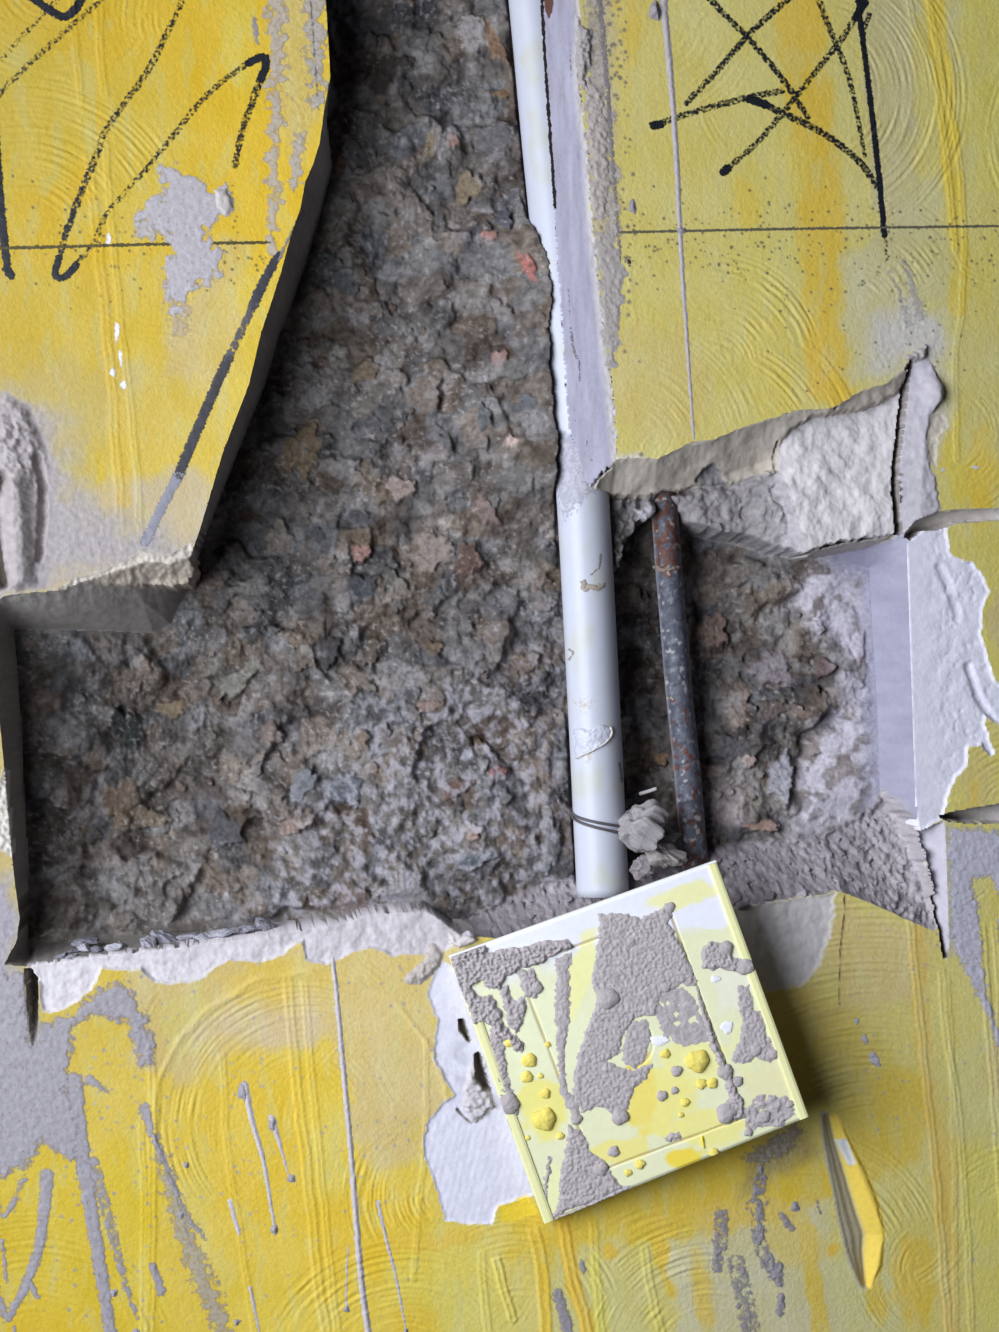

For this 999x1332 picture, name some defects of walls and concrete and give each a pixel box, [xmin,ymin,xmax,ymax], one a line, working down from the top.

peeling [214,188,234,217]
spalling [542,0,999,871]
crack [890,359,912,536]
spalling [58,544,201,593]
spalling [0,768,16,857]
peeling [734,890,837,993]
peeling [26,902,535,1225]